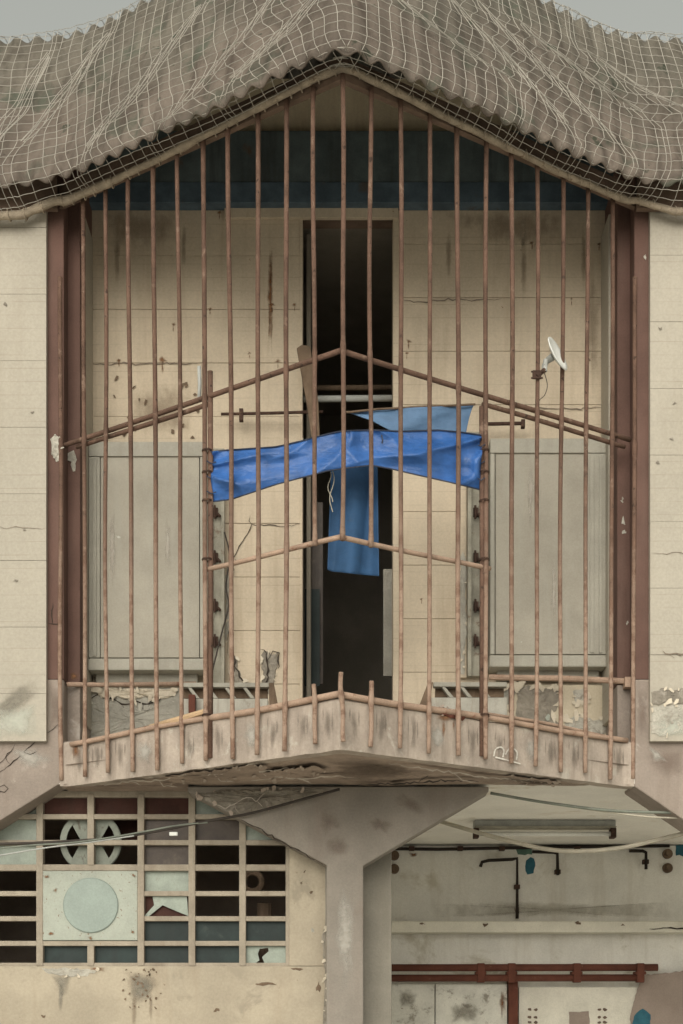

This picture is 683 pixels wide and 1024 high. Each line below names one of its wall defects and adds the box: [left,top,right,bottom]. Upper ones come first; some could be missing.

spalling [228,650,278,694]
spalling [90,687,179,736]
spalling [504,681,606,734]
peeling [650,687,683,738]
crack [0,725,57,793]
spalling [181,764,327,818]